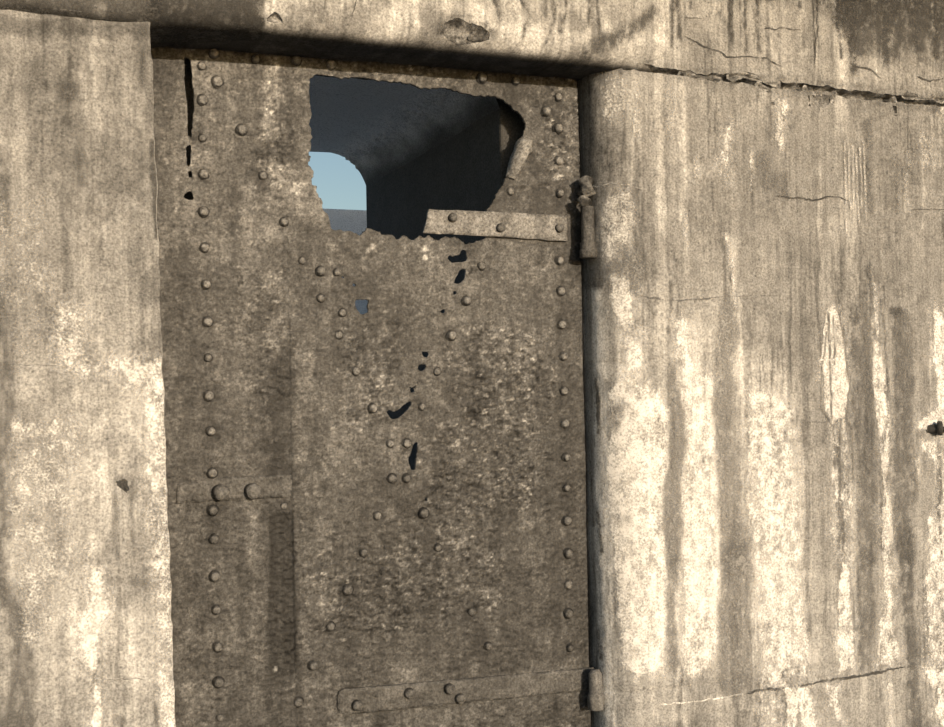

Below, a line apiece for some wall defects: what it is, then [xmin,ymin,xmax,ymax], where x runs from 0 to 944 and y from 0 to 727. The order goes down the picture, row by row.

leakage [0,0,266,47]
spalling [440,18,490,45]
leakage [568,0,655,62]
leakage [719,0,768,52]
crack [646,0,944,116]
leakage [814,0,944,74]
leakage [0,176,82,727]
leakage [53,303,175,727]
leakage [601,191,817,727]
leakage [853,303,879,670]
leakage [893,309,944,727]
crack [655,665,944,706]